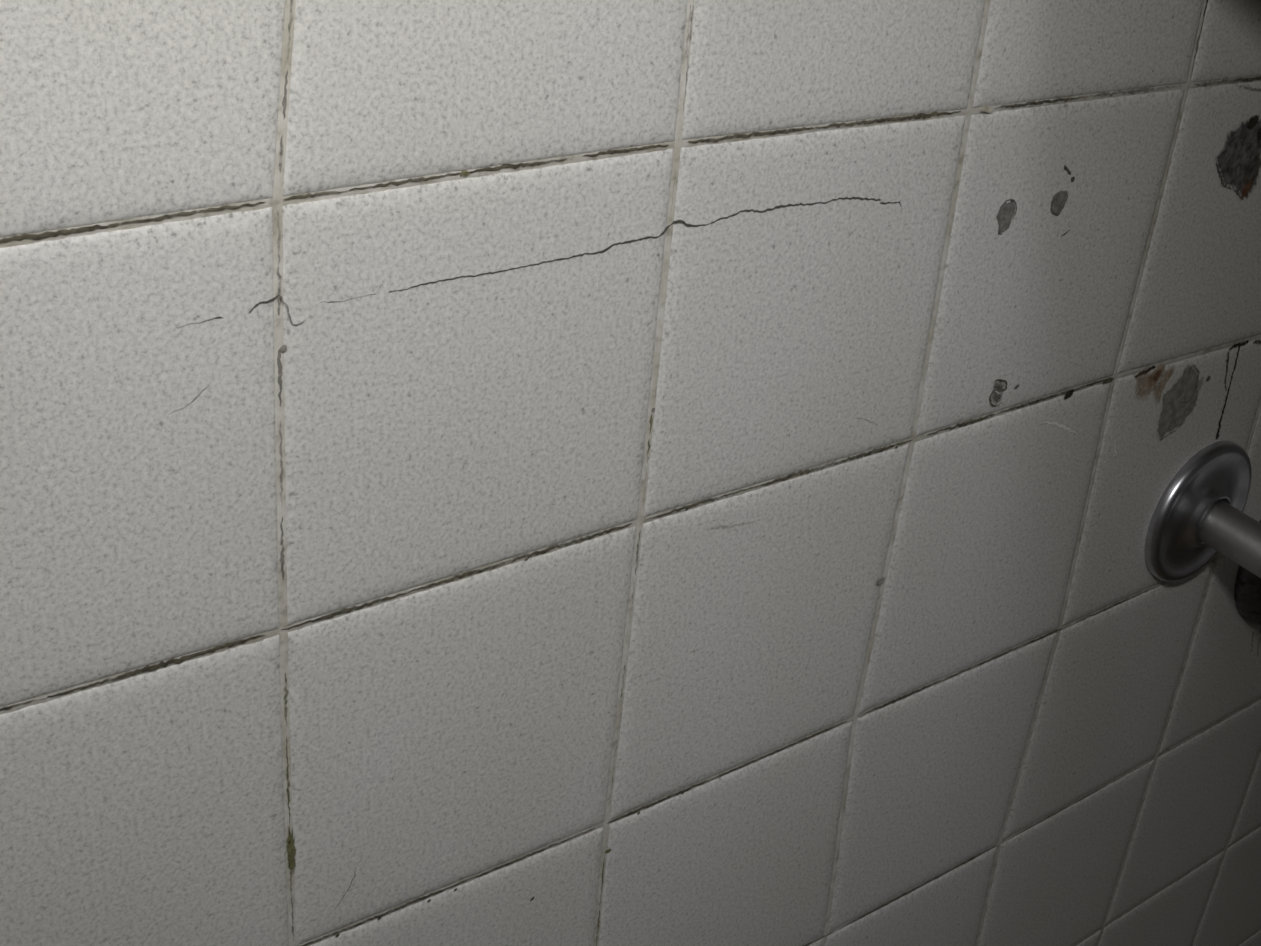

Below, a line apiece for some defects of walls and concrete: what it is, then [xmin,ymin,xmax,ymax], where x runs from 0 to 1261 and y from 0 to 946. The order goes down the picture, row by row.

crack [369,196,901,295]
peeling [996,199,1017,235]
peeling [1051,165,1075,216]
spalling [1216,115,1261,199]
crack [182,294,303,327]
spalling [1158,365,1210,440]
crack [1216,339,1261,439]